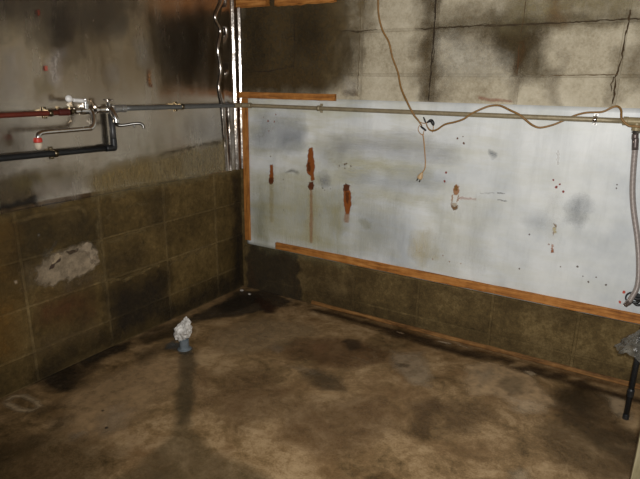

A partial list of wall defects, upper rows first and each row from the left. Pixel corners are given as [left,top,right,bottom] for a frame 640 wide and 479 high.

crack [420,0,640,104]
corrosion [306,148,315,190]
corrosion [343,184,351,214]
spalling [36,242,100,286]
water stain [106,179,301,334]